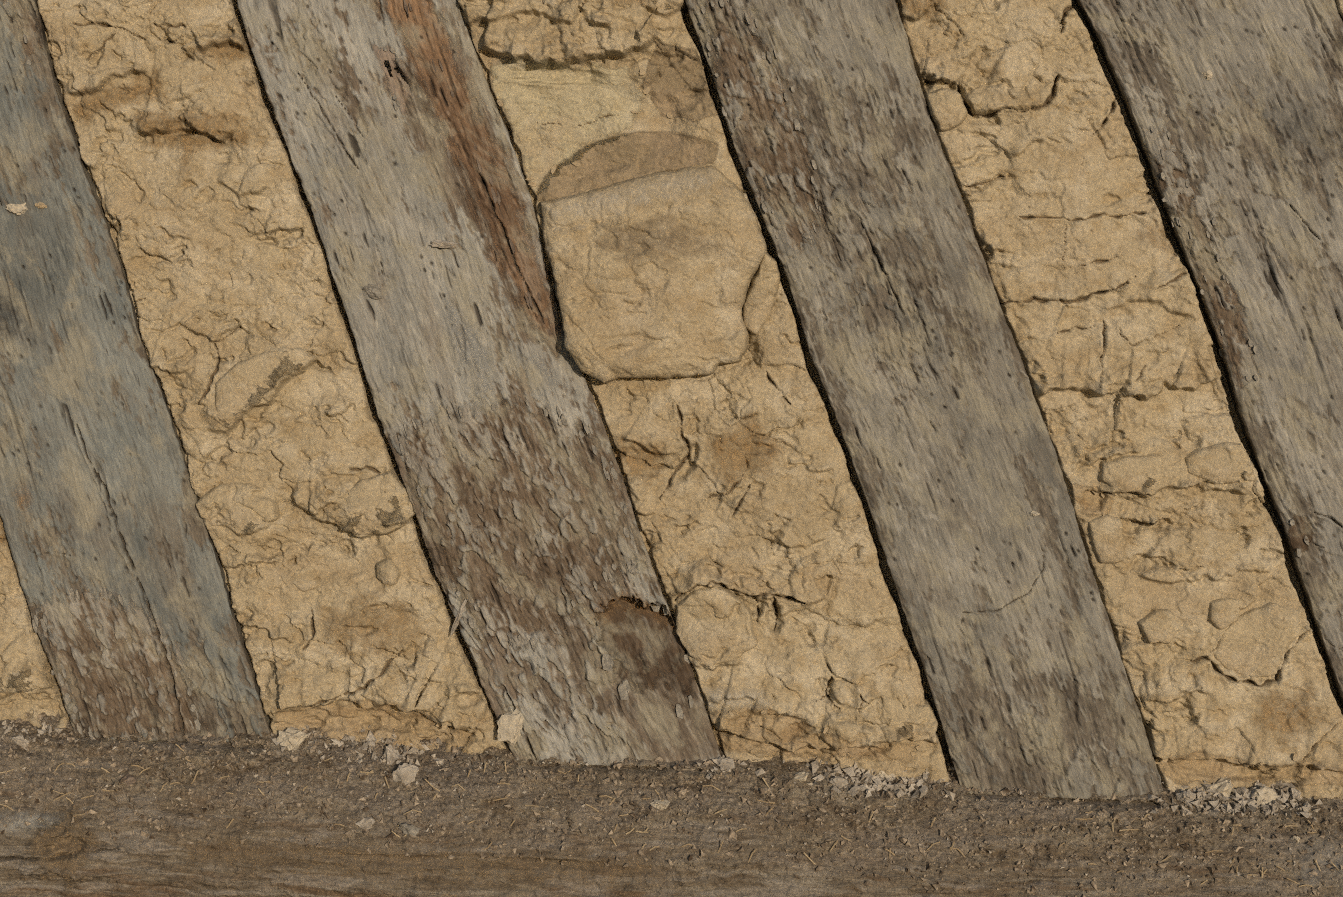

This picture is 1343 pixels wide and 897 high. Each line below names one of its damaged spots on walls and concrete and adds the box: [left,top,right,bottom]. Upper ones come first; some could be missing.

crack [659,407,690,499]
crack [705,453,750,515]
peeling [602,653,631,700]
crack [1191,631,1307,687]